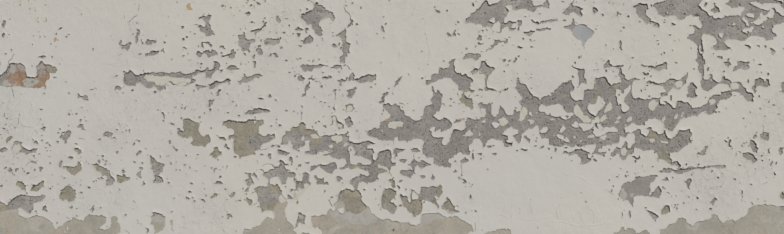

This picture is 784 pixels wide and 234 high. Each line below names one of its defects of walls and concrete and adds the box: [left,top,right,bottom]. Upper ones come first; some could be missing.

flaking render [0,125,197,234]
peeling [114,2,335,152]
peeling [174,0,784,234]